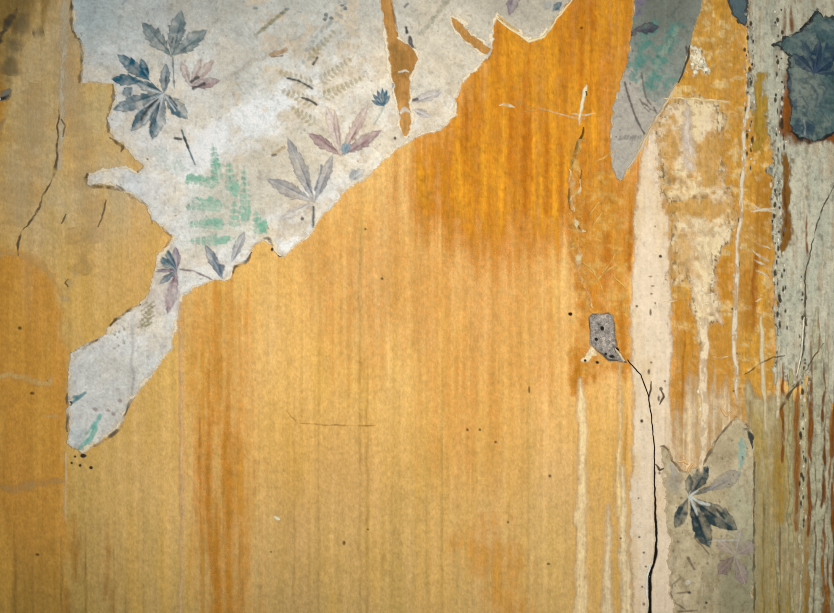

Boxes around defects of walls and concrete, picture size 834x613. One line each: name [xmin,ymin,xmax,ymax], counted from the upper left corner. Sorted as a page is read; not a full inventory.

crack [17,116,64,249]
water stain [414,0,632,255]
peeling [580,95,740,613]
peeling [690,45,710,76]
peeling [742,0,834,613]
crack [628,360,665,613]
water stain [745,381,813,613]